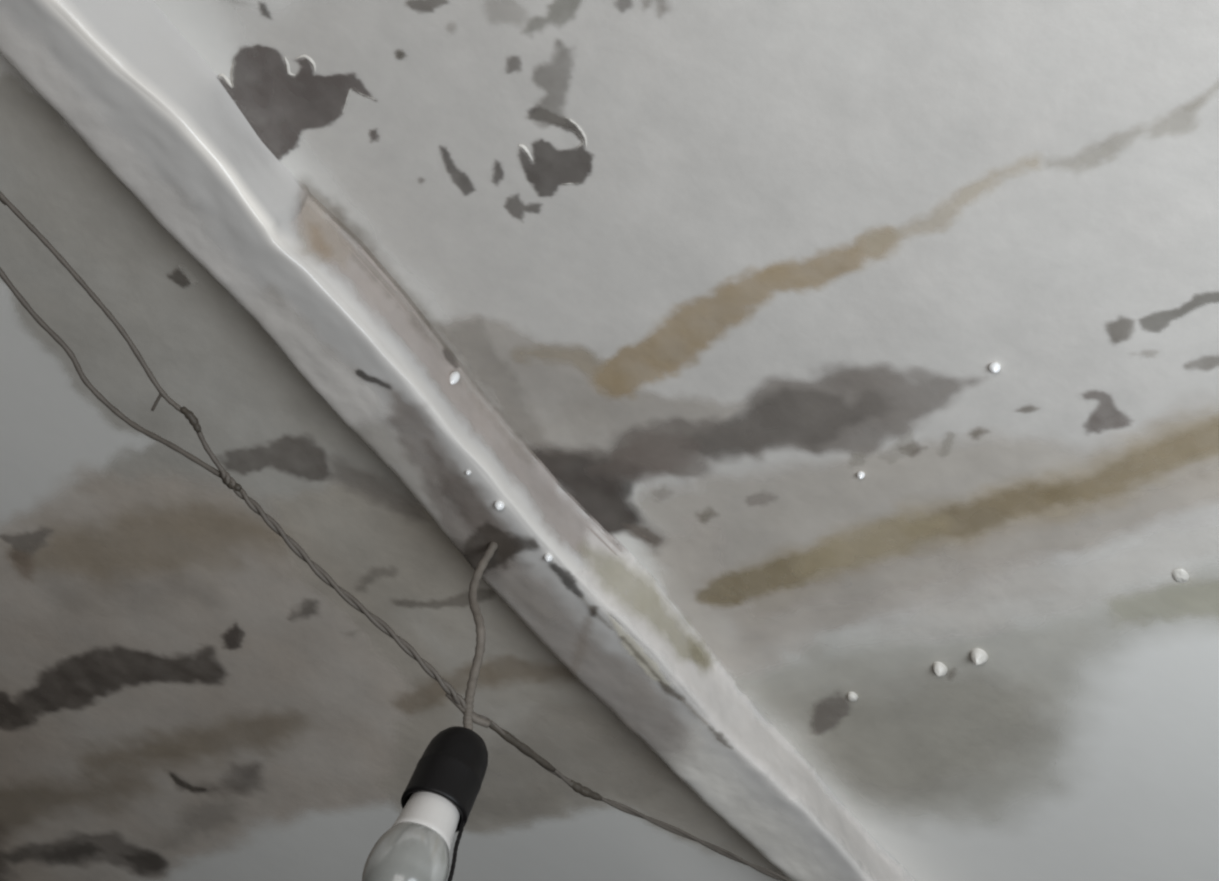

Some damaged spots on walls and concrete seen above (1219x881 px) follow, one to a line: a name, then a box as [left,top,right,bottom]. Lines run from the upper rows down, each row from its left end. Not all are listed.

peeling [408,0,446,11]
leakage [281,6,356,76]
peeling [218,45,377,159]
peeling [442,148,474,194]
peeling [506,68,592,218]
peeling [1109,293,1219,342]
leakage [299,0,1219,881]
peeling [1085,392,1129,432]
leakage [0,76,818,881]
peeling [225,627,243,648]
peeling [0,648,224,728]
peeling [813,698,848,734]